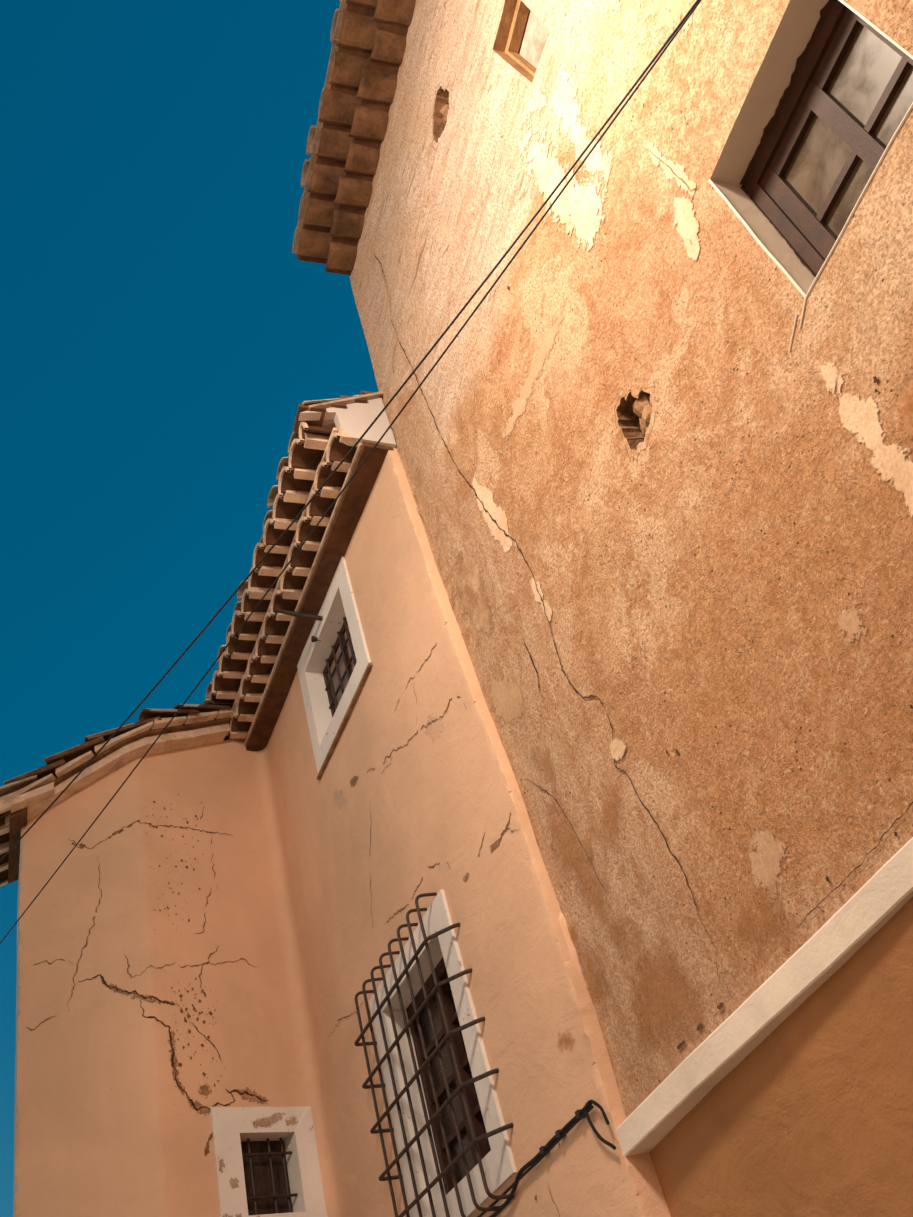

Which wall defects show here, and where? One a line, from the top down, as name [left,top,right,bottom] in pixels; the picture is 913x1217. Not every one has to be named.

spalling [432,83,452,150]
peeling [516,53,614,253]
spalling [614,386,657,461]
crack [358,253,735,1000]
crack [794,802,913,931]
crack [26,806,269,1156]